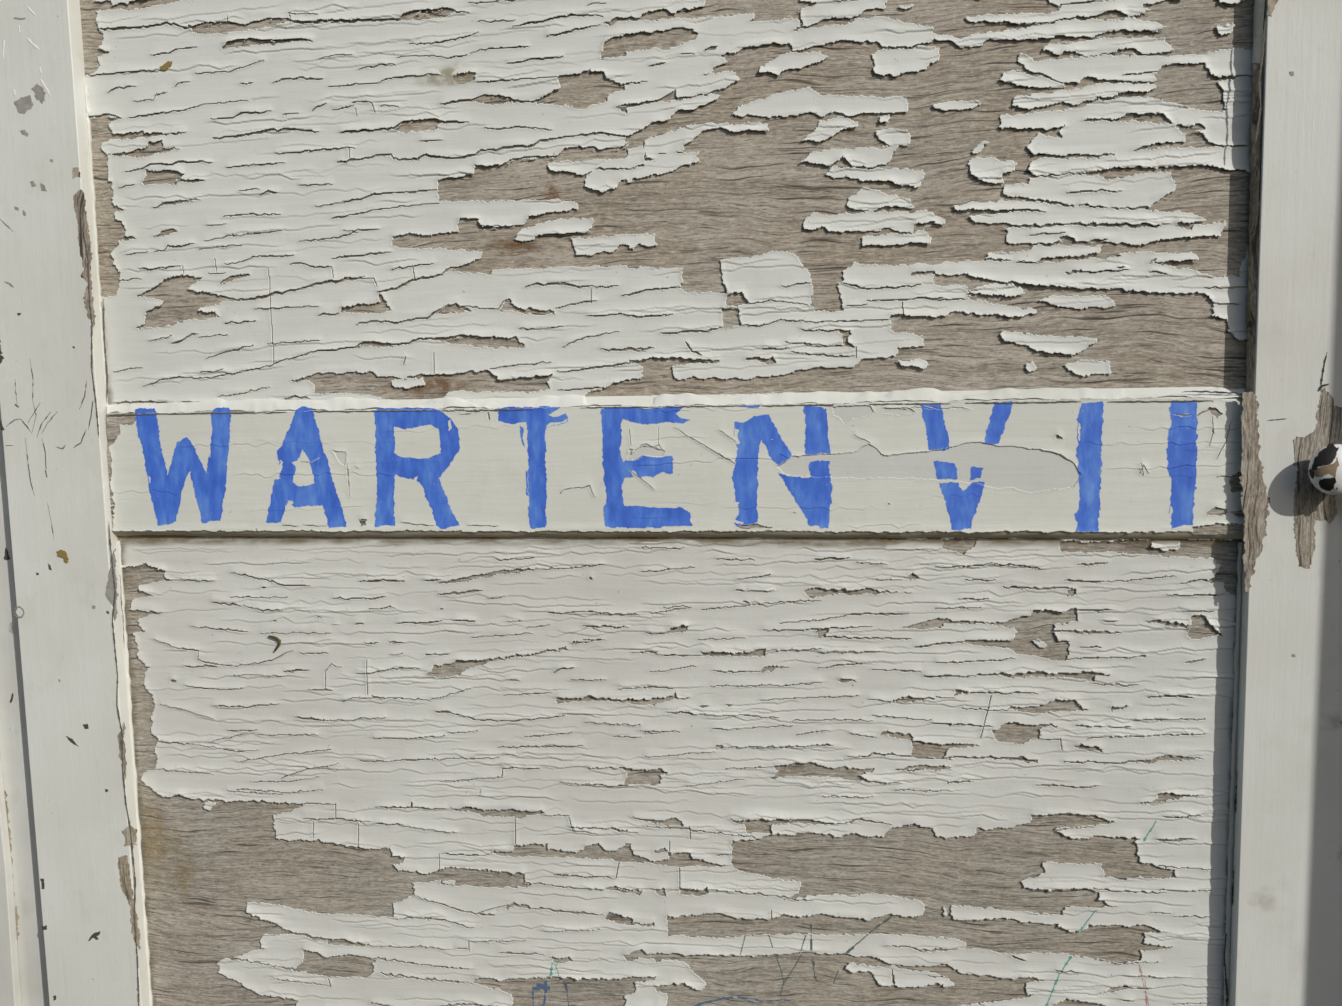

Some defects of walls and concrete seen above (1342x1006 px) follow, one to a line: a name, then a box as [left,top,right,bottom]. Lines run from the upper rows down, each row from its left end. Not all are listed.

peeling [72,0,1278,598]
peeling [1293,387,1342,569]
peeling [92,549,1223,1006]